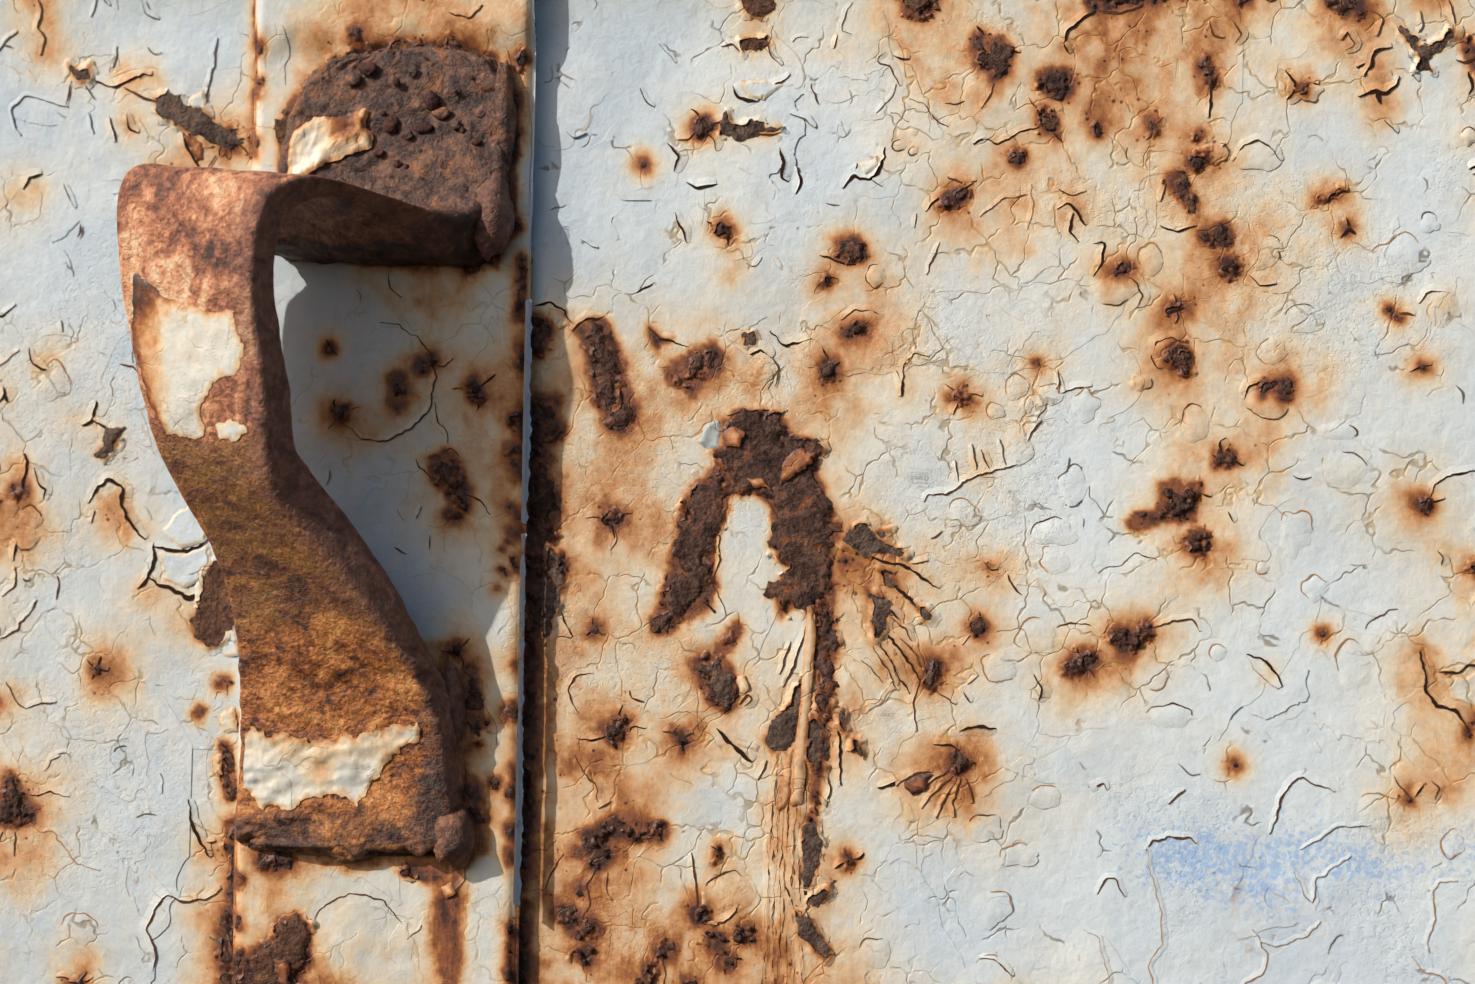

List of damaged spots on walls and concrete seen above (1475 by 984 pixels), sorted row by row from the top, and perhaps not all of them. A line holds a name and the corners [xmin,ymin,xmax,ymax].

crack [1389,0,1464,81]
crack [636,140,718,293]
crack [733,0,1156,289]
crack [0,320,175,600]
rust [0,0,1150,984]
crack [769,328,1082,539]
rust [949,0,1475,860]
crack [6,680,57,709]
crack [136,773,215,857]
crack [542,852,613,918]
crack [683,725,767,780]
crack [915,673,1018,797]